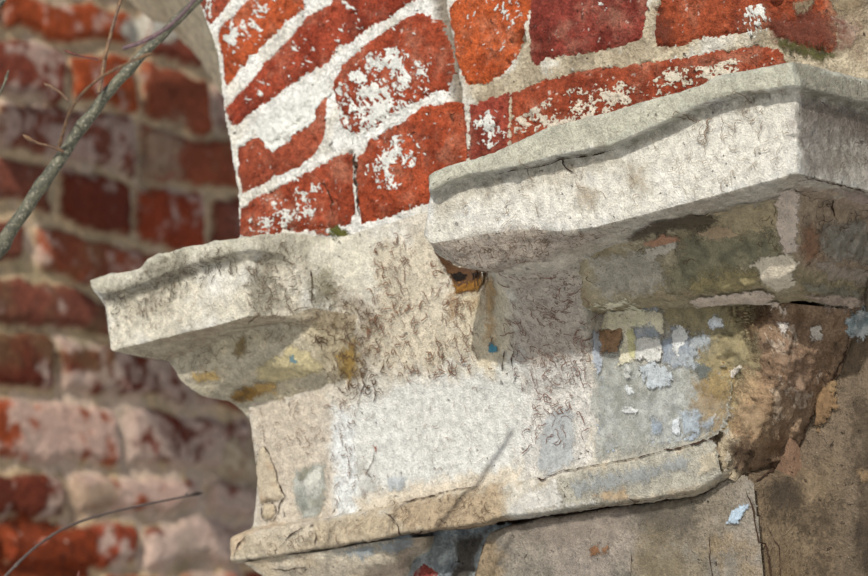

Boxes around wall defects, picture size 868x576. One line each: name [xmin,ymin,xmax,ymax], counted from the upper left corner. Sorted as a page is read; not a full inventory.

crack [651,91,868,272]
crack [93,150,714,575]
spalling [580,188,868,481]
leakage [729,305,772,363]
crack [821,336,849,385]
peeling [505,407,688,516]
leakage [727,436,755,470]
crack [798,413,816,448]
crack [745,466,781,576]